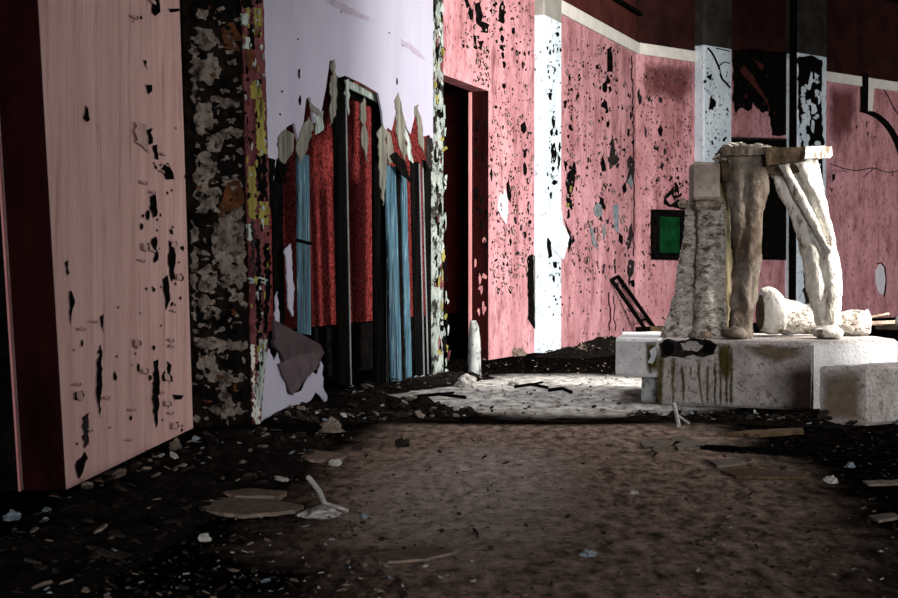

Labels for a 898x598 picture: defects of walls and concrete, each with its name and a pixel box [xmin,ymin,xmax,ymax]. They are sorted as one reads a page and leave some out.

peeling [704,0,825,156]
flaking render [132,0,451,426]
flaking render [462,0,535,329]
peeling [546,26,693,332]
peeling [69,291,104,350]
peeling [75,344,110,478]
peeling [132,338,184,432]
spalling [648,338,717,364]
leakage [649,348,733,404]